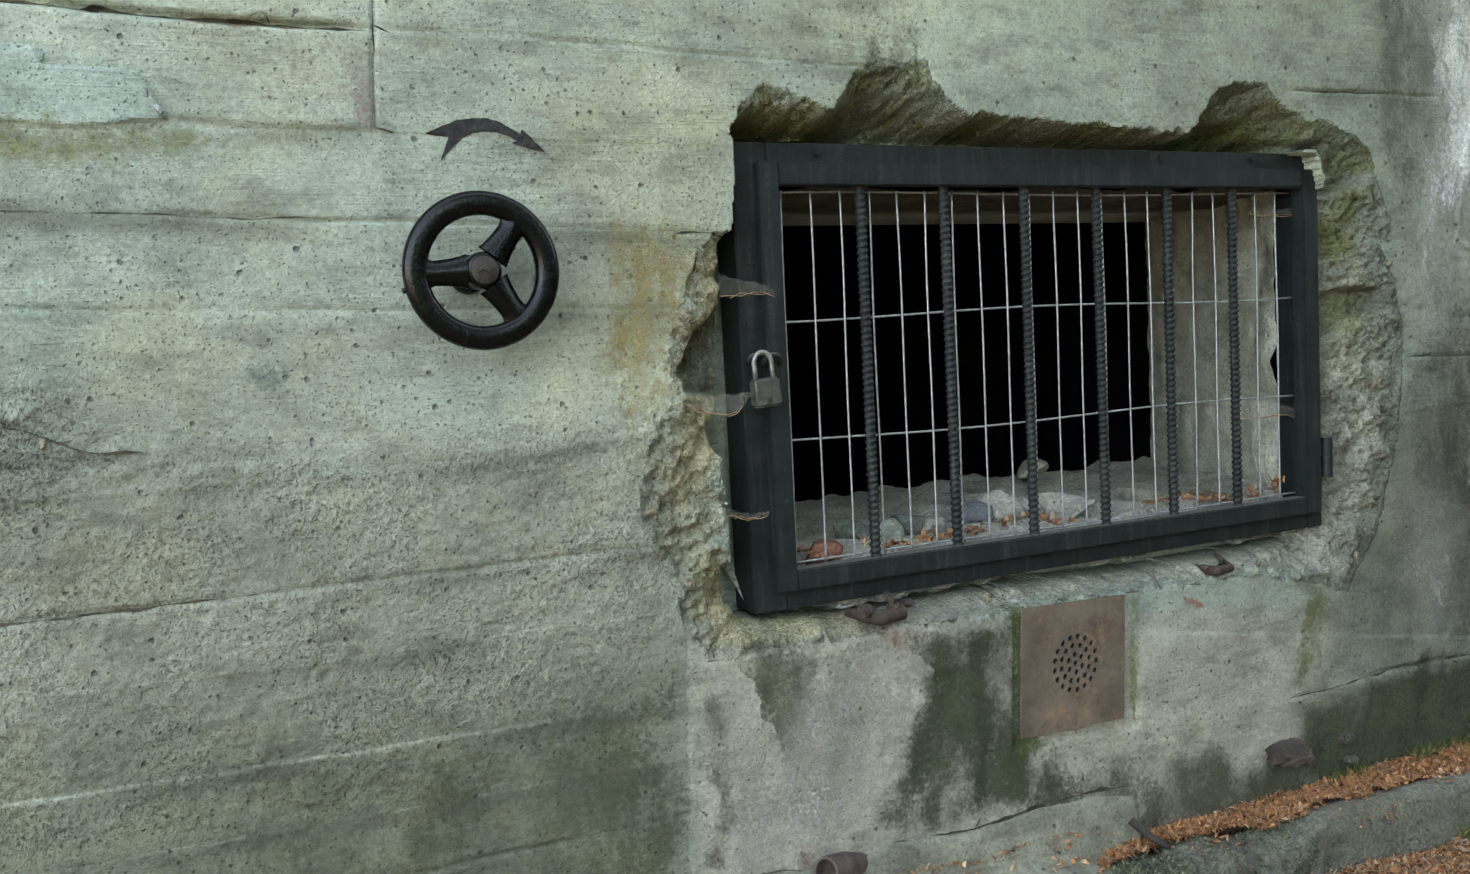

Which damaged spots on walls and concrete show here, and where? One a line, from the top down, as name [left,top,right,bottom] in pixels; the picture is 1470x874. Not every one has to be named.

crack [0,0,393,133]
leakage [1380,0,1470,232]
crack [0,422,143,455]
spalling [639,57,1403,660]
leakage [1398,363,1470,691]
leakage [898,669,955,797]